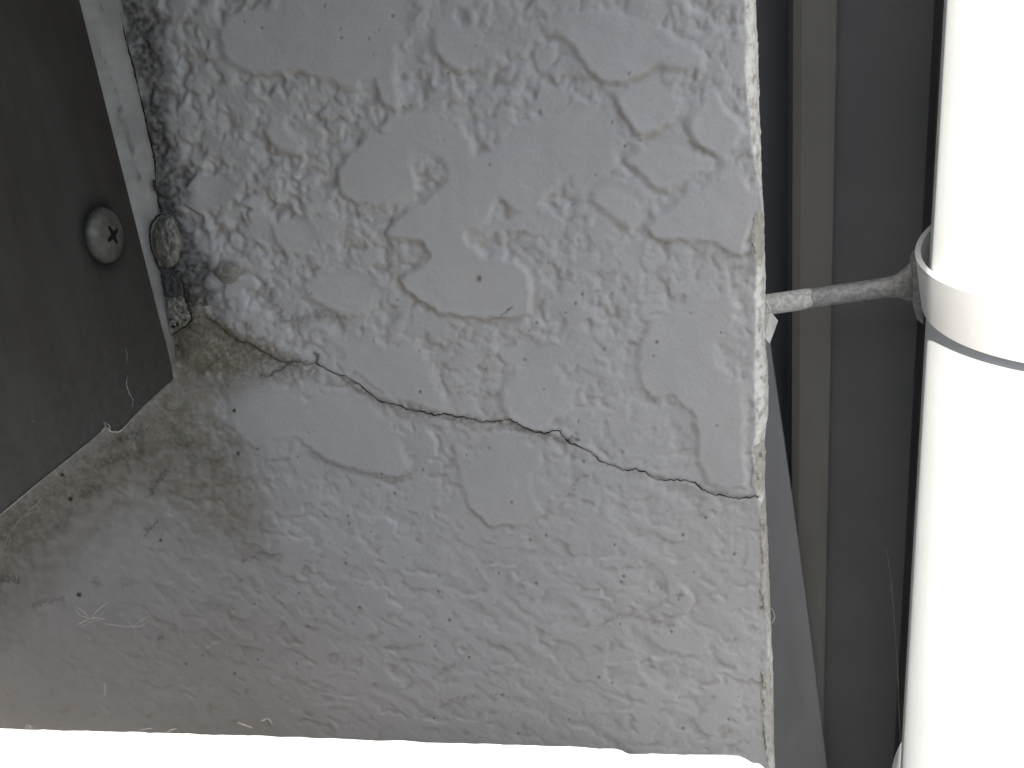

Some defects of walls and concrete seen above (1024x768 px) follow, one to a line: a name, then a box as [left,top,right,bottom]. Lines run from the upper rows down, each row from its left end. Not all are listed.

crack [209,318,760,500]